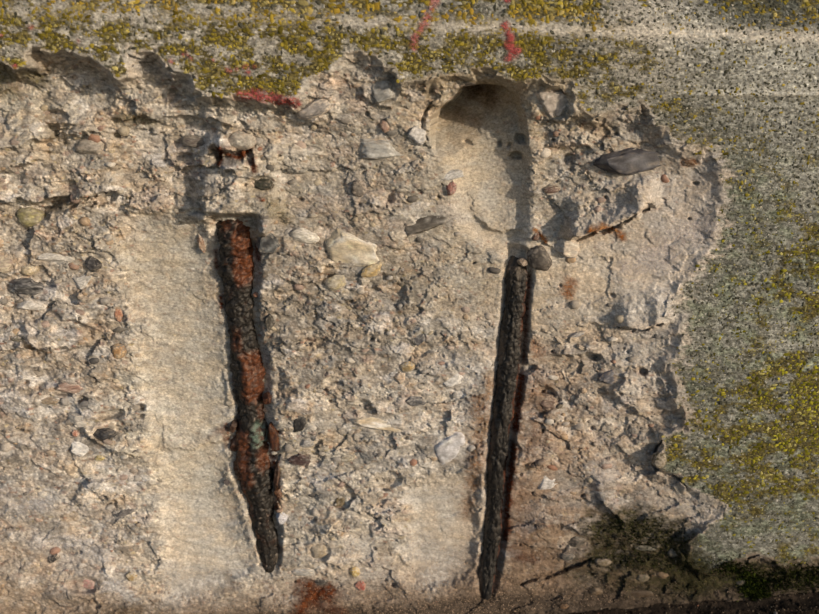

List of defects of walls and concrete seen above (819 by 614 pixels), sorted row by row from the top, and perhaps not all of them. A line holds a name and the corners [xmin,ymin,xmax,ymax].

corrosion [216,146,257,173]
spalling [197,234,207,253]
corrosion [517,258,531,358]
corrosion [224,419,239,452]
corrosion [267,422,282,509]
corrosion [463,376,493,517]
corrosion [503,374,545,541]
spalling [475,539,484,568]
water stain [586,541,819,595]
spalling [727,554,819,596]
corrosion [294,579,337,614]